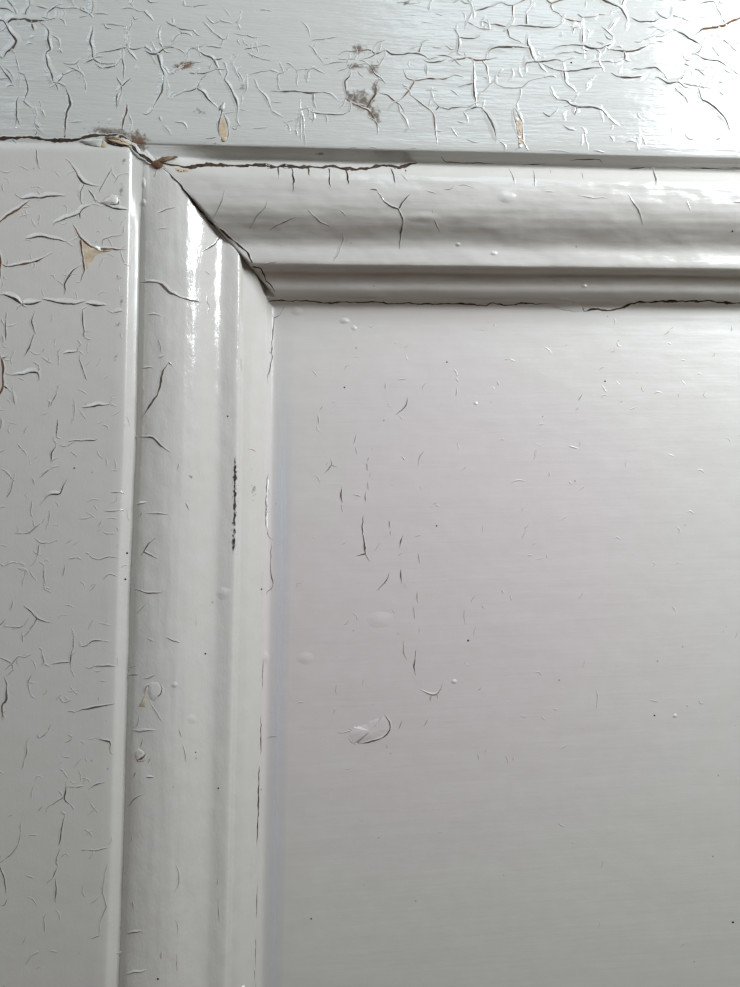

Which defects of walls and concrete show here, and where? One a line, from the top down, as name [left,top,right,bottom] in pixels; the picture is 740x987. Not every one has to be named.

peeling [216,102,230,142]
crack [125,700,187,807]
crack [256,717,279,846]
crack [0,724,179,976]